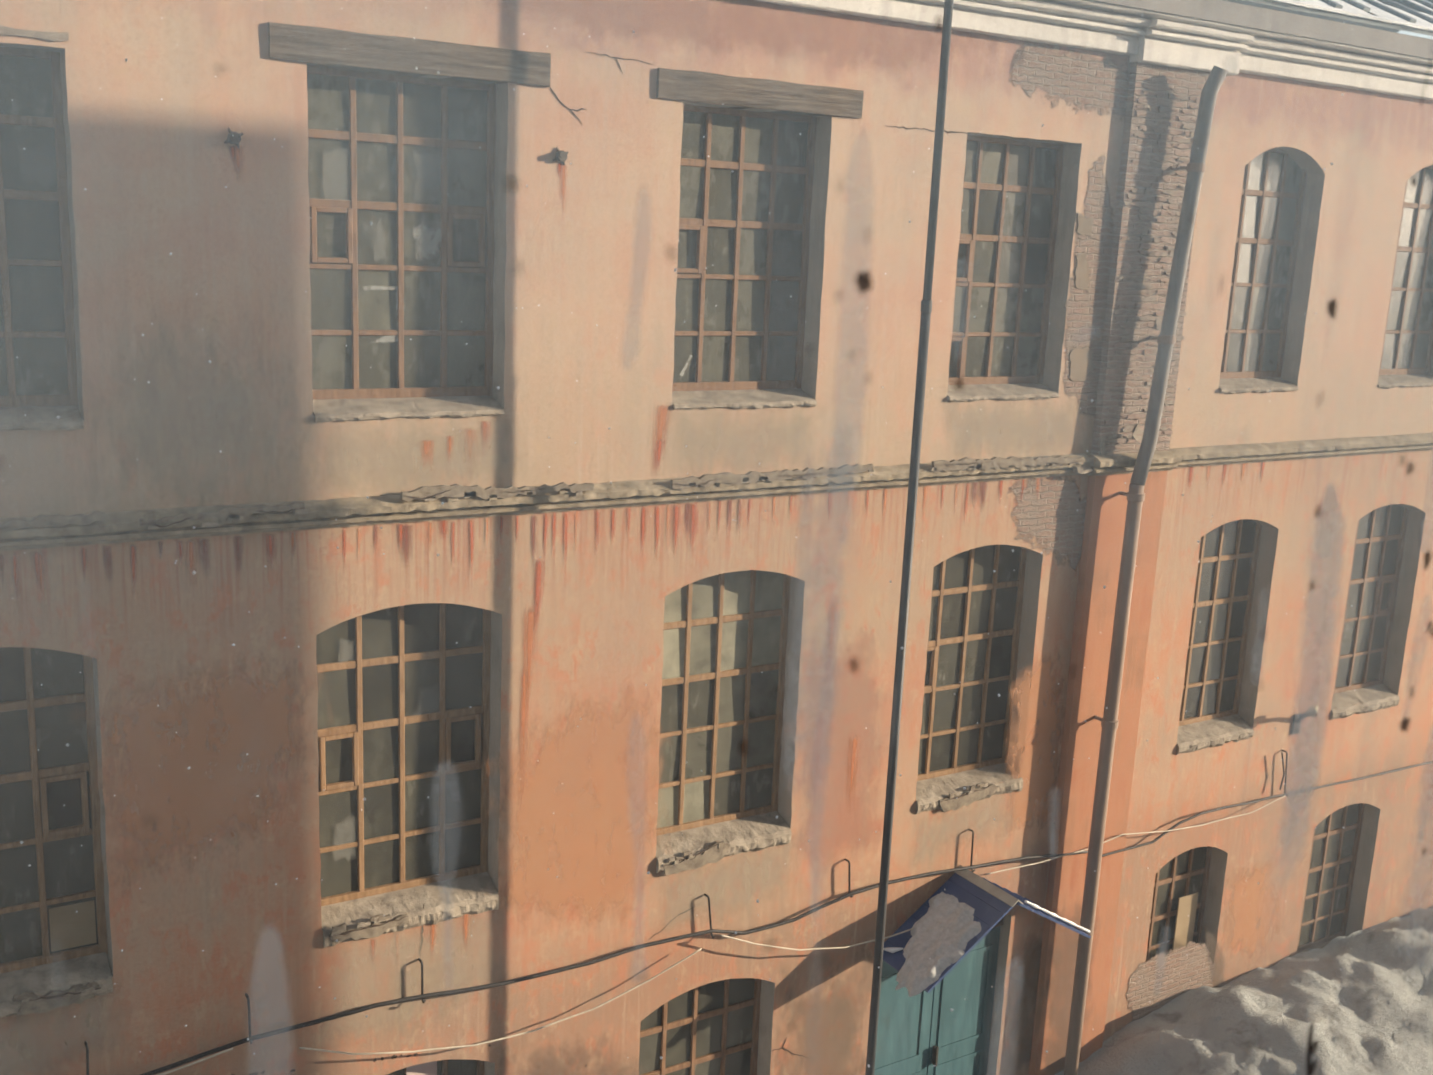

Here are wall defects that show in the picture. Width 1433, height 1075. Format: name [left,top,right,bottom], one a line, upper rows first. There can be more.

crack [586,52,653,74]
crack [550,87,587,124]